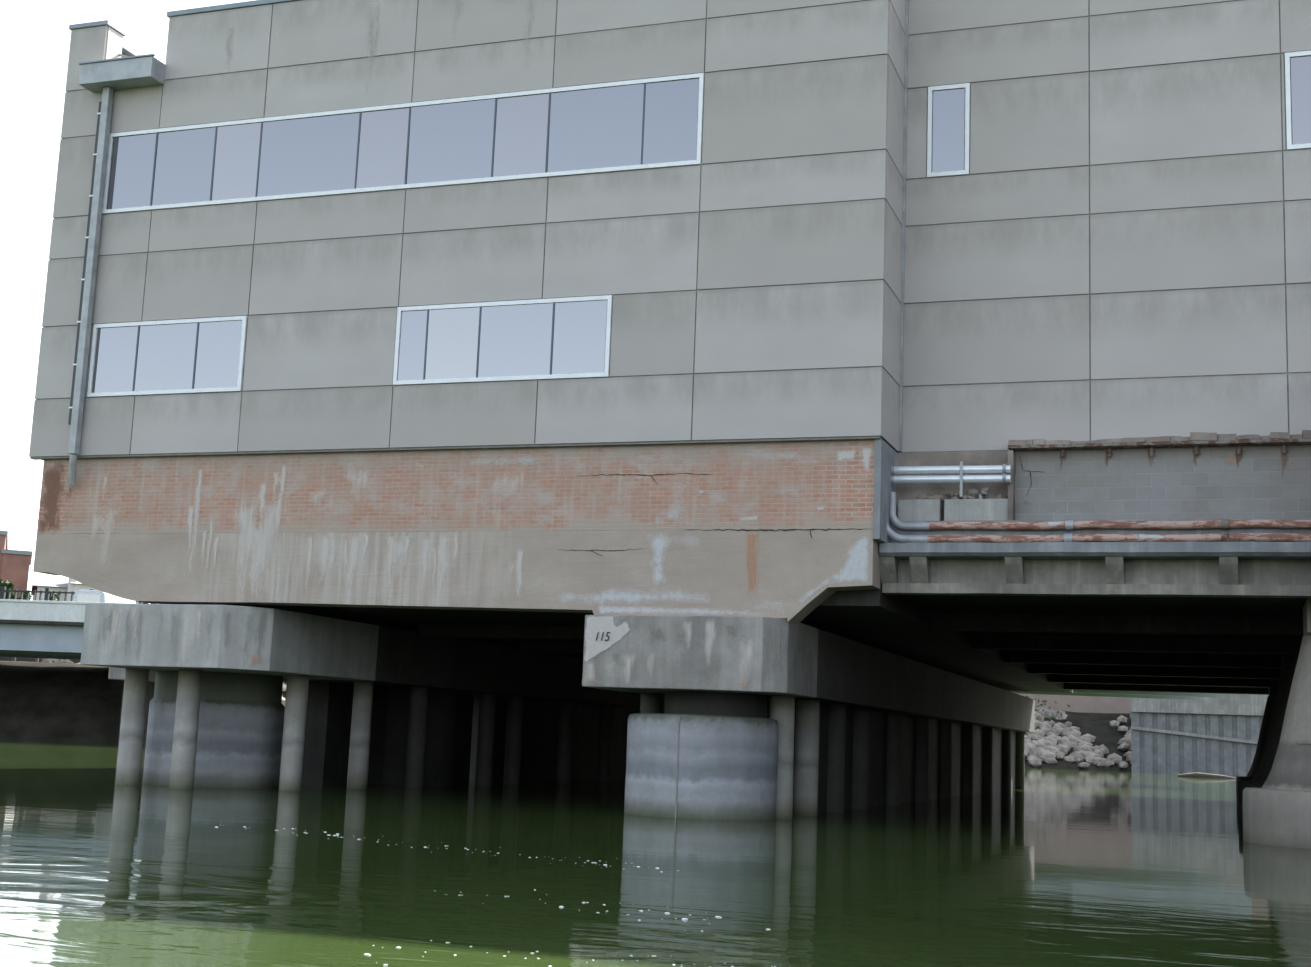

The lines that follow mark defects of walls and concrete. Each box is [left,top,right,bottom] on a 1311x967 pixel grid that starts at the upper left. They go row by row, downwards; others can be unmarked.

crack [577,473,712,481]
leakage [188,470,218,571]
leakage [238,466,285,589]
crack [557,548,642,556]
corrosion [747,535,757,590]